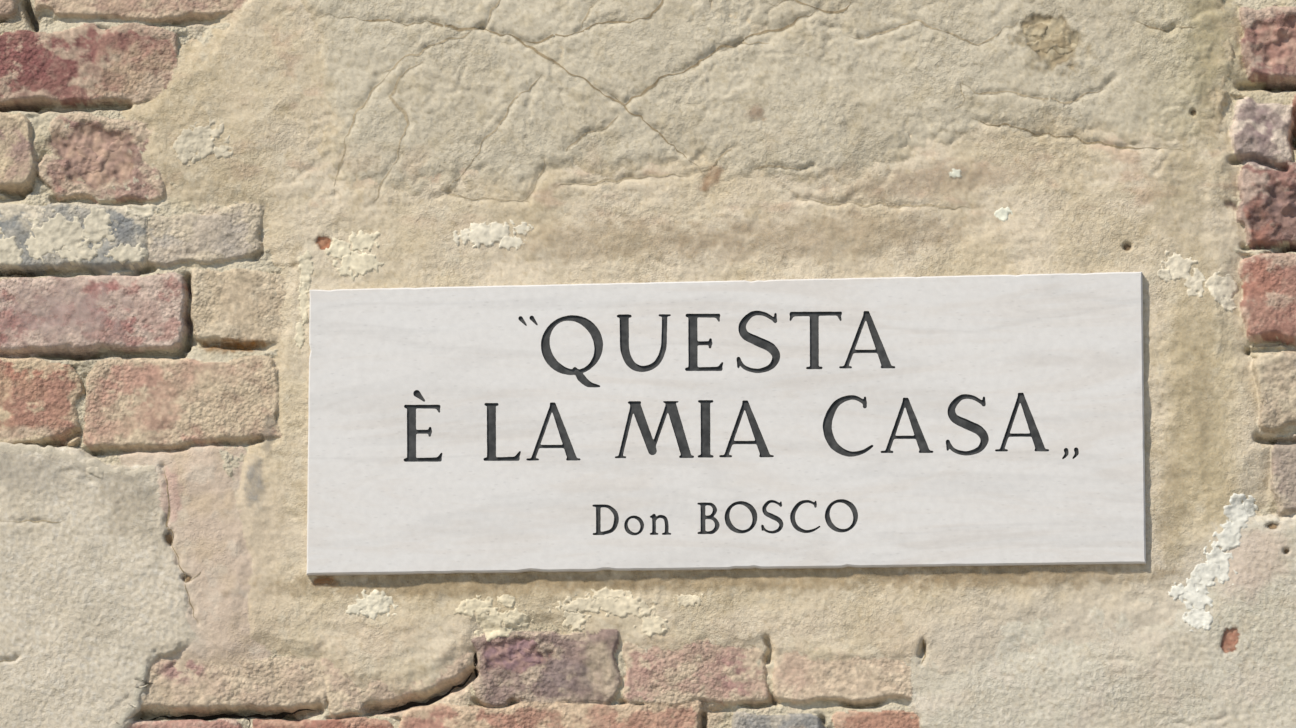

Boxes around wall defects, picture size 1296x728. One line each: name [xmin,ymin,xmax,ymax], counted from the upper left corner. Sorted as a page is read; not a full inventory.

crack [1137,21,1196,32]
spalling [1252,16,1296,68]
spalling [51,124,133,188]
peeling [172,118,233,167]
crack [323,0,1019,210]
crack [955,78,1186,152]
peeling [0,201,162,277]
peeling [0,442,155,482]
peeling [453,587,708,673]
peeling [108,664,153,728]